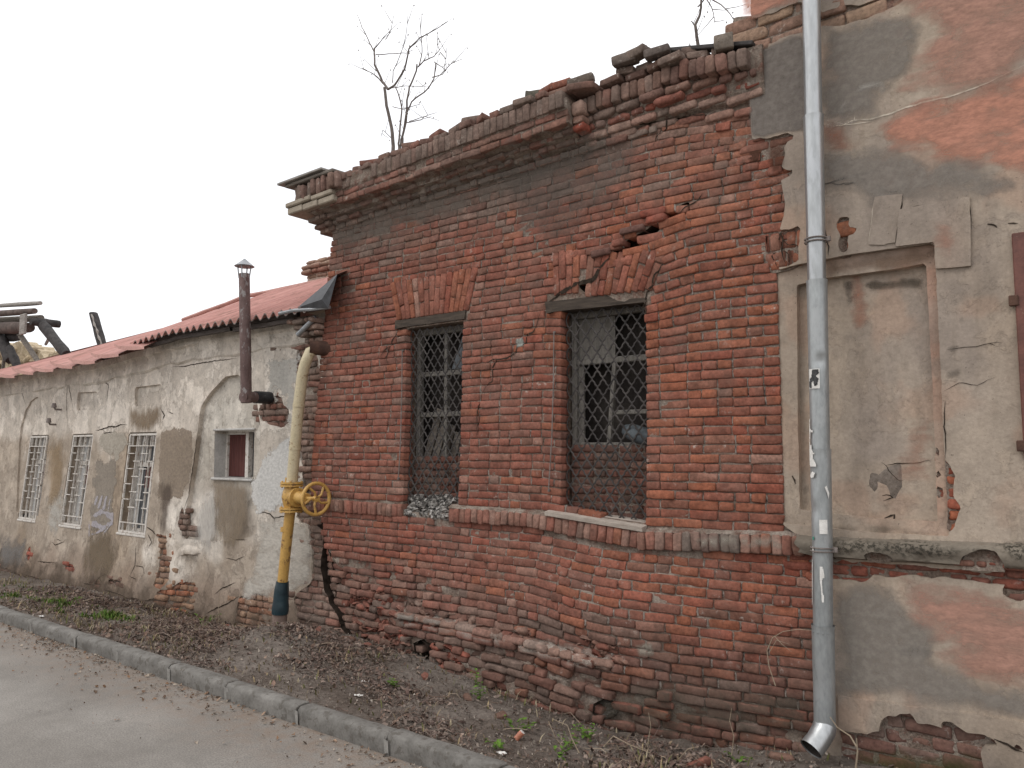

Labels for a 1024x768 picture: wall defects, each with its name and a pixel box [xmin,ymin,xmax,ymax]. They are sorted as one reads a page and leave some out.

flaking render [723,134,802,273]
flaking render [837,218,856,258]
crack [476,193,703,426]
water stain [161,486,171,529]
flaking render [251,344,535,669]
crack [882,379,989,519]
flaking render [936,448,960,531]
flaking render [90,508,200,612]
flaking render [227,593,273,627]
crack [317,522,359,634]
flaking render [833,549,1024,601]
flaking render [840,714,996,768]